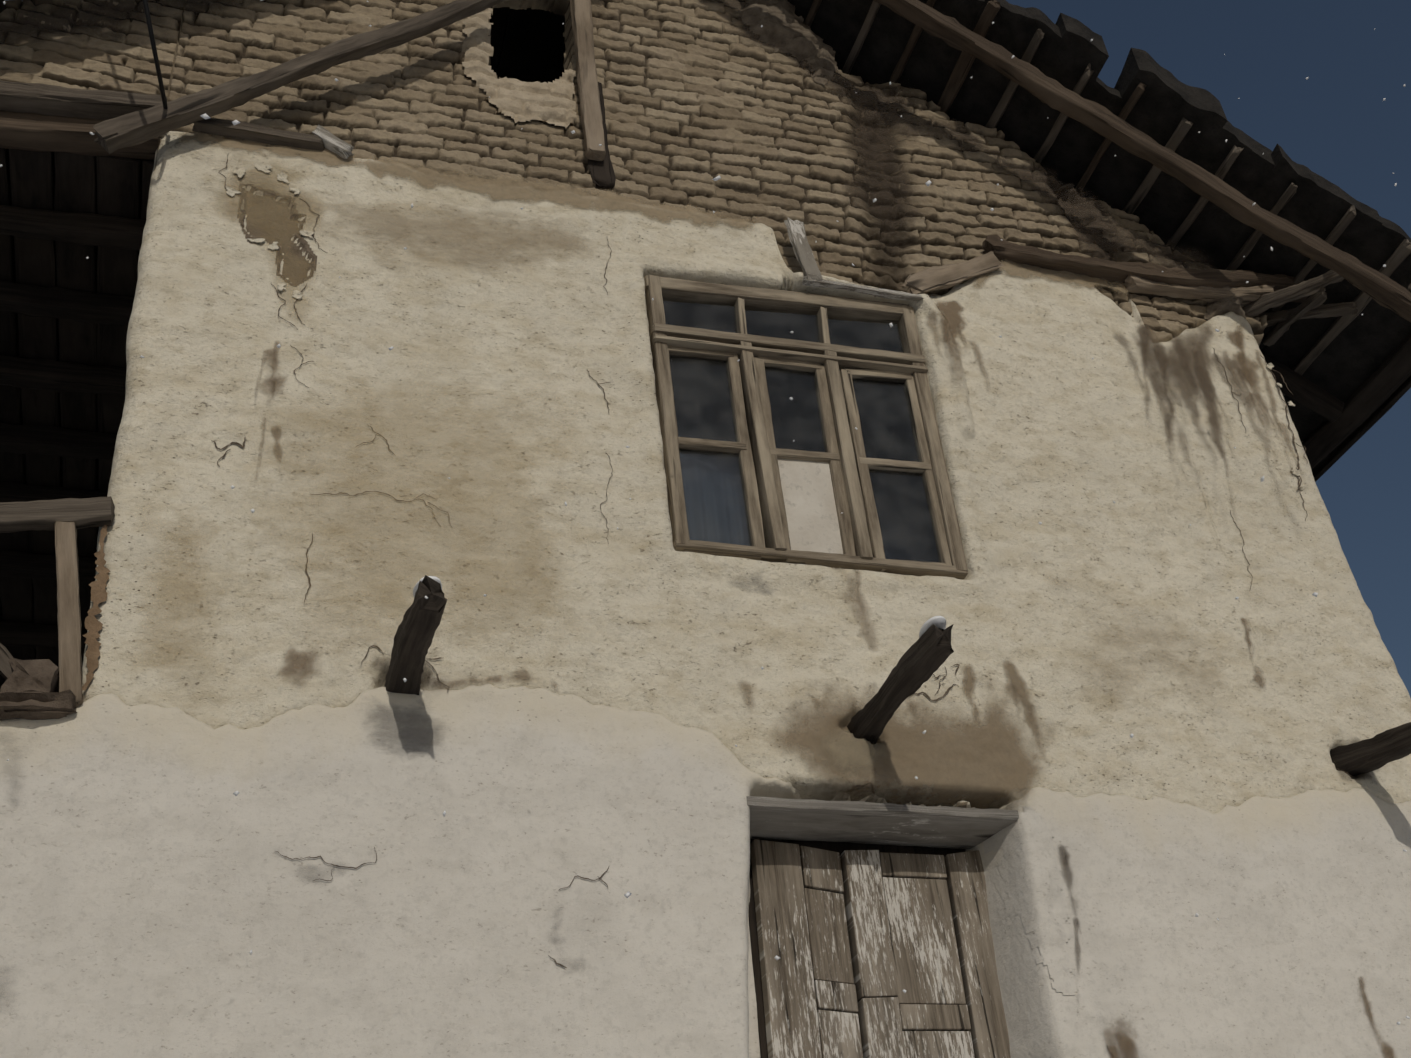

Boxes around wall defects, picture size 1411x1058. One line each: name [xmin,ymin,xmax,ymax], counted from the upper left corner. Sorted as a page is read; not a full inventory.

spalling [226,163,317,299]
leakage [937,301,964,358]
leakage [1141,326,1223,453]
leakage [1229,332,1274,409]
crack [213,437,246,467]
crack [1261,356,1308,521]
crack [311,491,453,528]
crack [304,534,313,602]
crack [909,664,960,701]
leakage [783,663,1037,809]
crack [275,847,377,881]
crack [558,867,609,891]